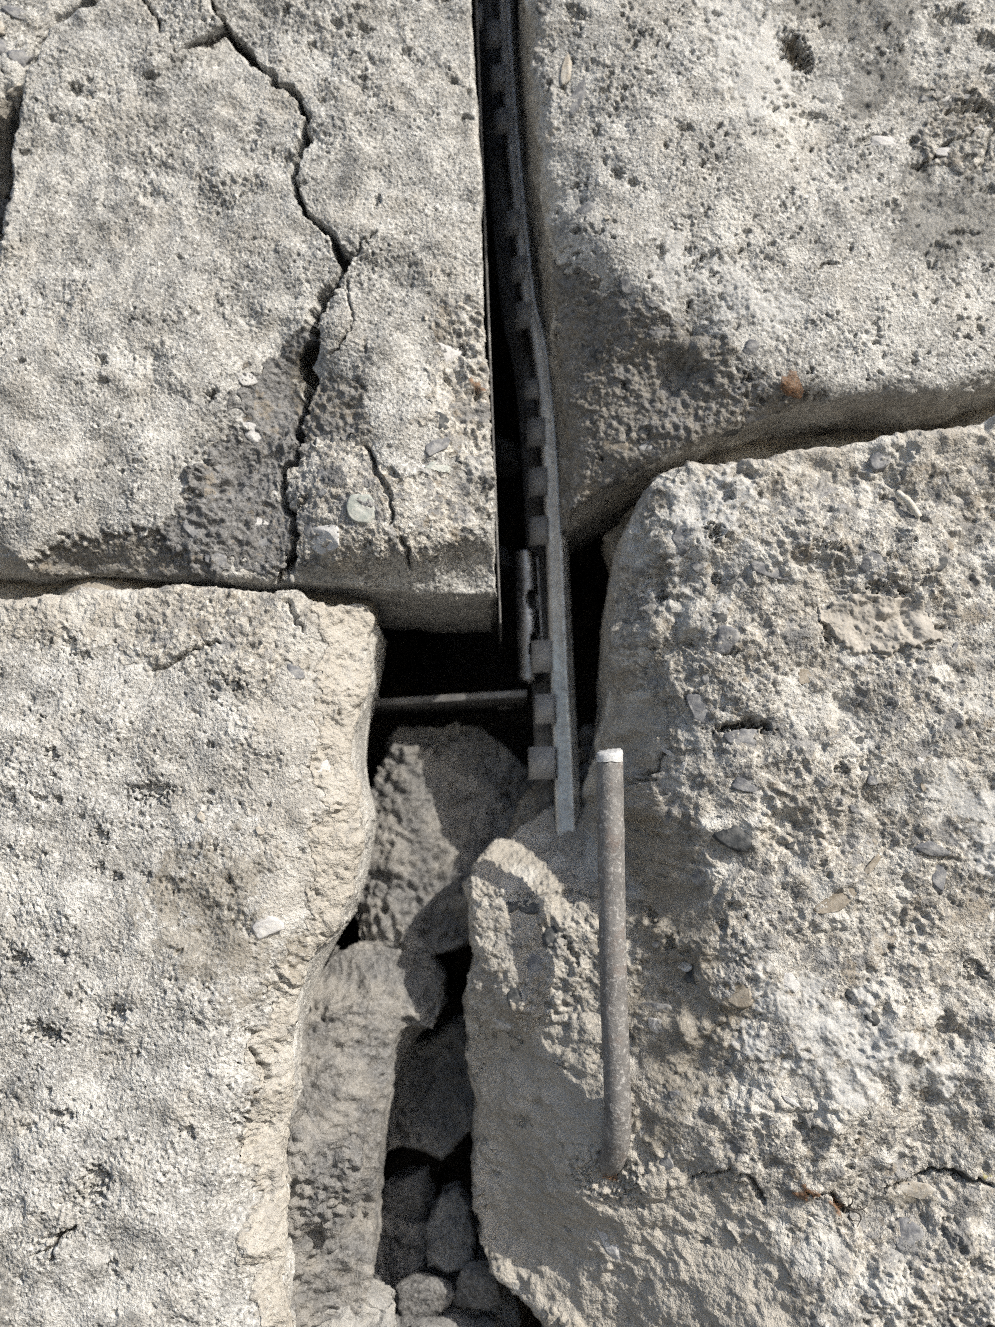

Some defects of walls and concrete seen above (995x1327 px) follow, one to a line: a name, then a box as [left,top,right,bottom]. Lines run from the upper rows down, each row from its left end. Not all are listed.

crack [194,6,311,220]
crack [283,234,372,517]
crack [368,449,411,562]
crack [278,555,303,630]
spalling [0,293,497,1327]
crack [828,1192,844,1212]
crack [889,1166,991,1188]